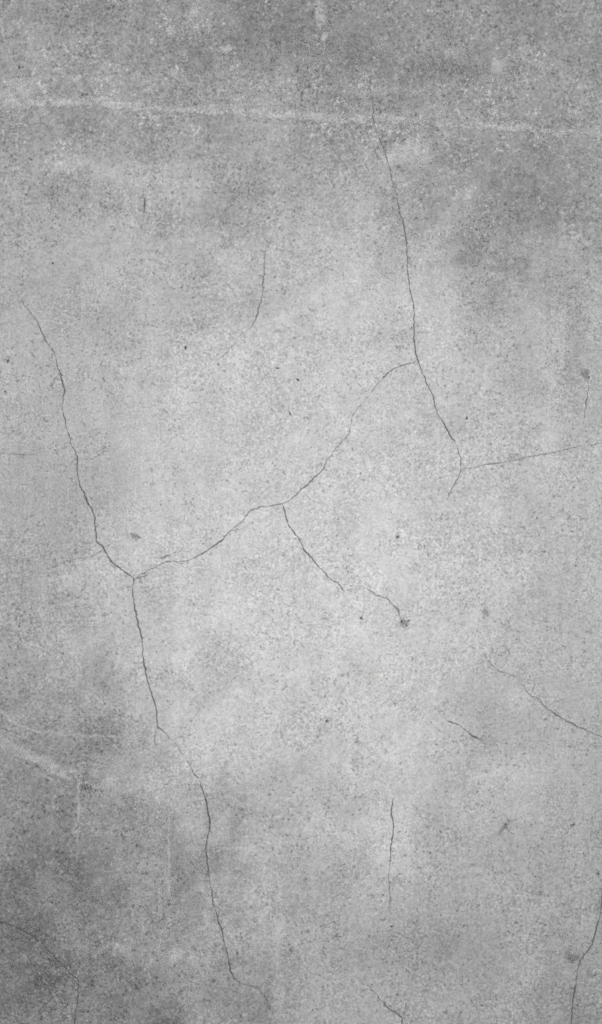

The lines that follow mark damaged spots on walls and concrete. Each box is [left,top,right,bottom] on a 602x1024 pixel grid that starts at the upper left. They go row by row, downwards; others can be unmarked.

crack [372,205,461,482]
crack [23,303,343,732]
crack [194,774,211,870]
crack [387,800,395,900]
crack [0,922,79,1024]
crack [571,895,602,1024]